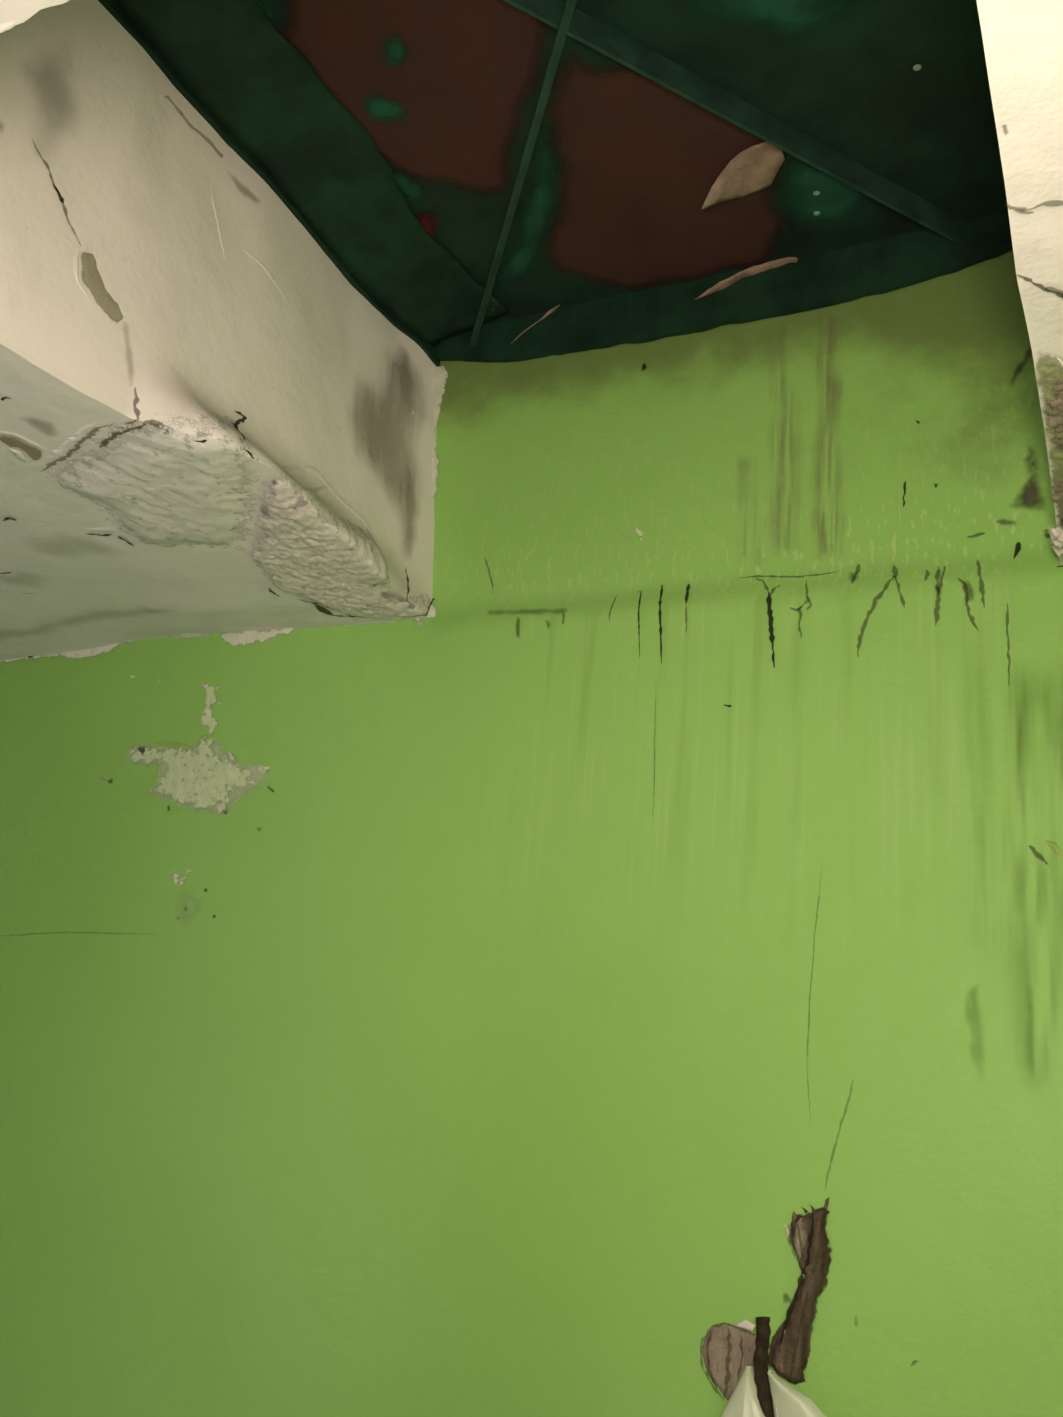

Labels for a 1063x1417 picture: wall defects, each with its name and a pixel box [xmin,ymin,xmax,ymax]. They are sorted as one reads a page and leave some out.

spalling [0,21,16,33]
peeling [73,249,123,322]
damp [1020,458,1040,507]
flaking render [1037,355,1063,567]
flaking render [251,461,435,618]
damp [756,578,780,668]
crack [743,571,835,579]
damp [791,581,812,636]
damp [857,565,905,657]
damp [925,560,985,630]
peeling [129,683,274,814]
flaking render [700,1197,832,1400]